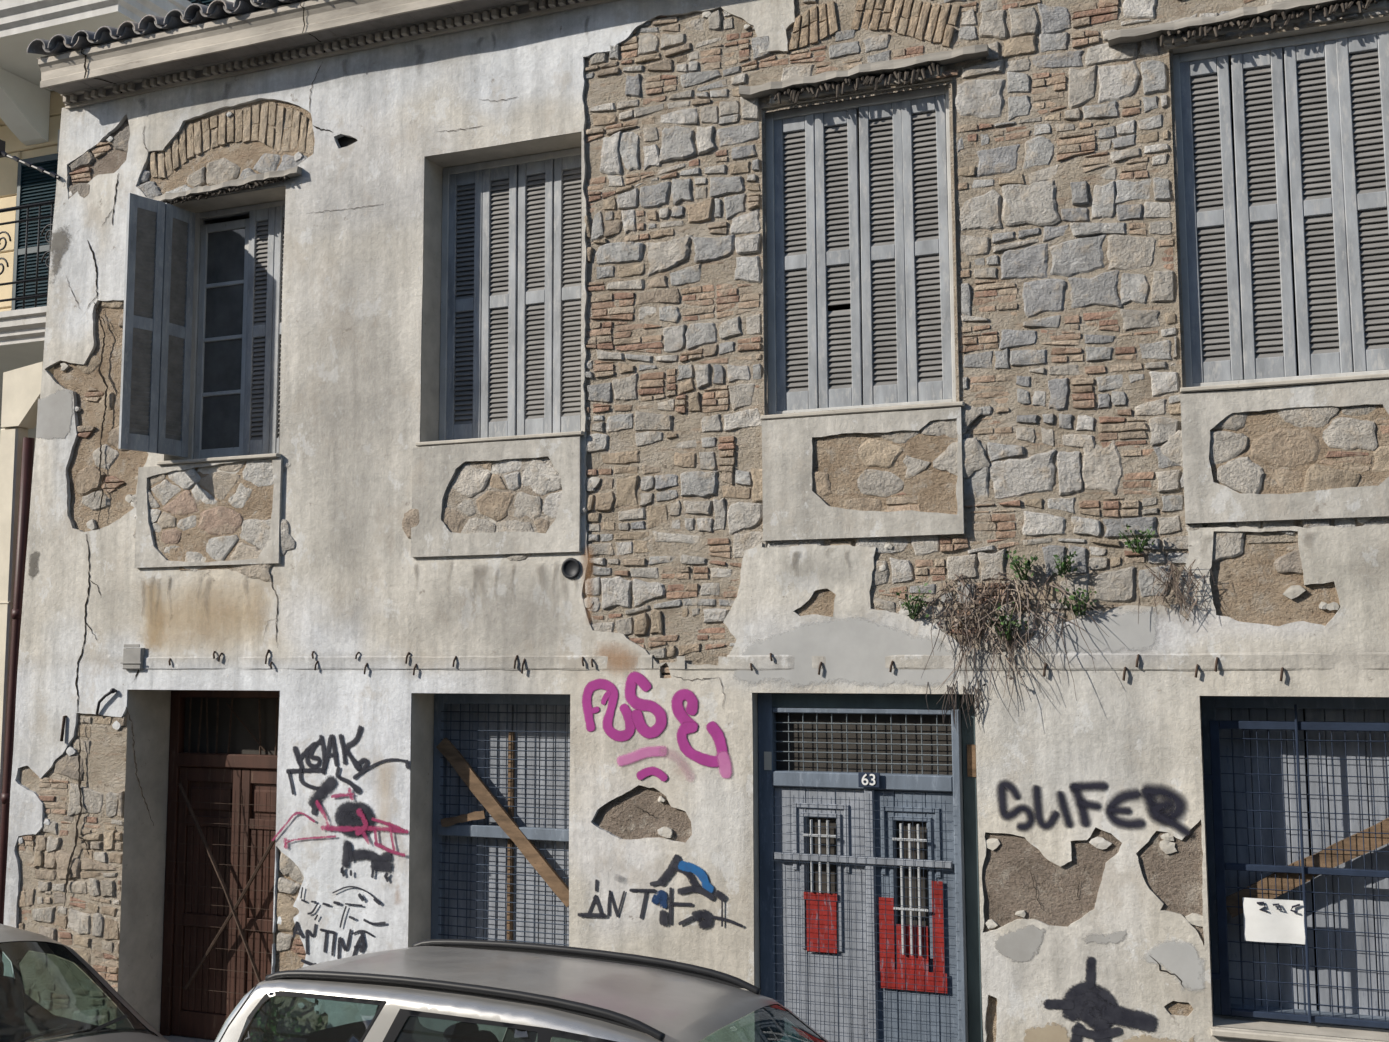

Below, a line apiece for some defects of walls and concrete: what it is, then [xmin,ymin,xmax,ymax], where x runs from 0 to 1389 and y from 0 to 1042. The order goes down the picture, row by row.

flaking render [68,118,130,198]
flaking render [137,100,315,199]
flaking render [580,0,1389,678]
crack [63,173,119,908]
flaking render [53,300,296,582]
flaking render [442,457,562,534]
flaking render [16,709,128,1006]
crack [126,669,154,826]
flaking render [275,850,306,972]
flaking render [593,785,692,843]
flaking render [982,827,1126,962]
flaking render [1136,819,1204,944]